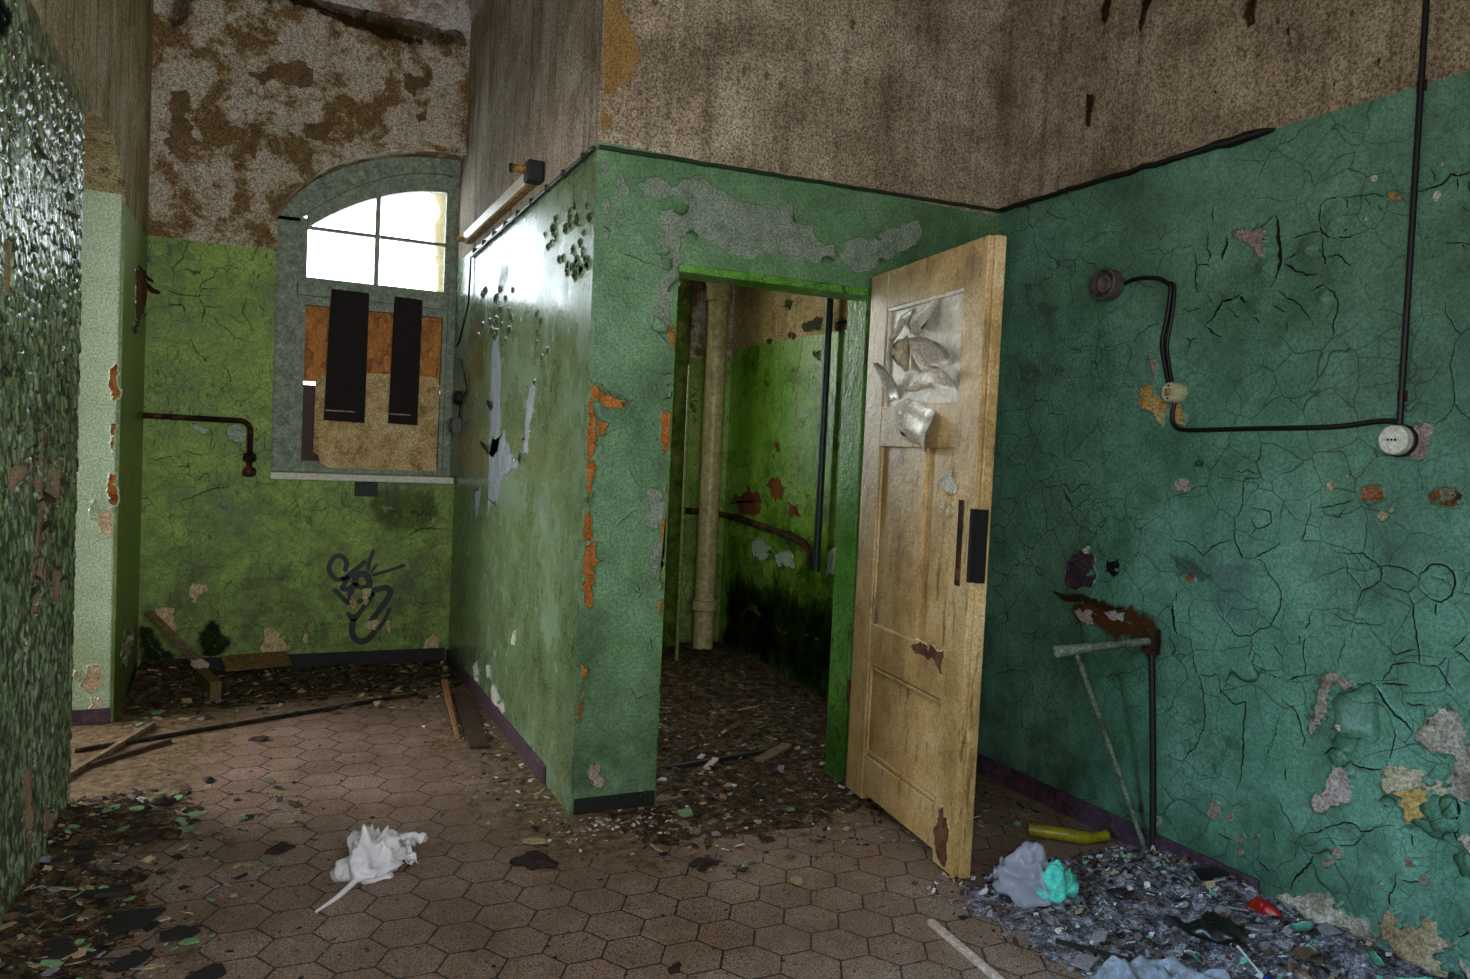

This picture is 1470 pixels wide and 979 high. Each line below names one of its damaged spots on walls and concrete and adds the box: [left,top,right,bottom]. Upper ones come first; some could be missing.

leakage [171,0,193,29]
leakage [268,0,465,47]
peeling [246,58,315,90]
peeling [162,89,198,158]
peeling [32,137,81,218]
peeling [543,162,922,351]
crack [1131,168,1470,349]
crack [1435,299,1470,427]
peeling [472,629,517,714]
crack [1164,468,1470,979]
peeling [1305,667,1380,815]
flaking render [1269,881,1470,979]